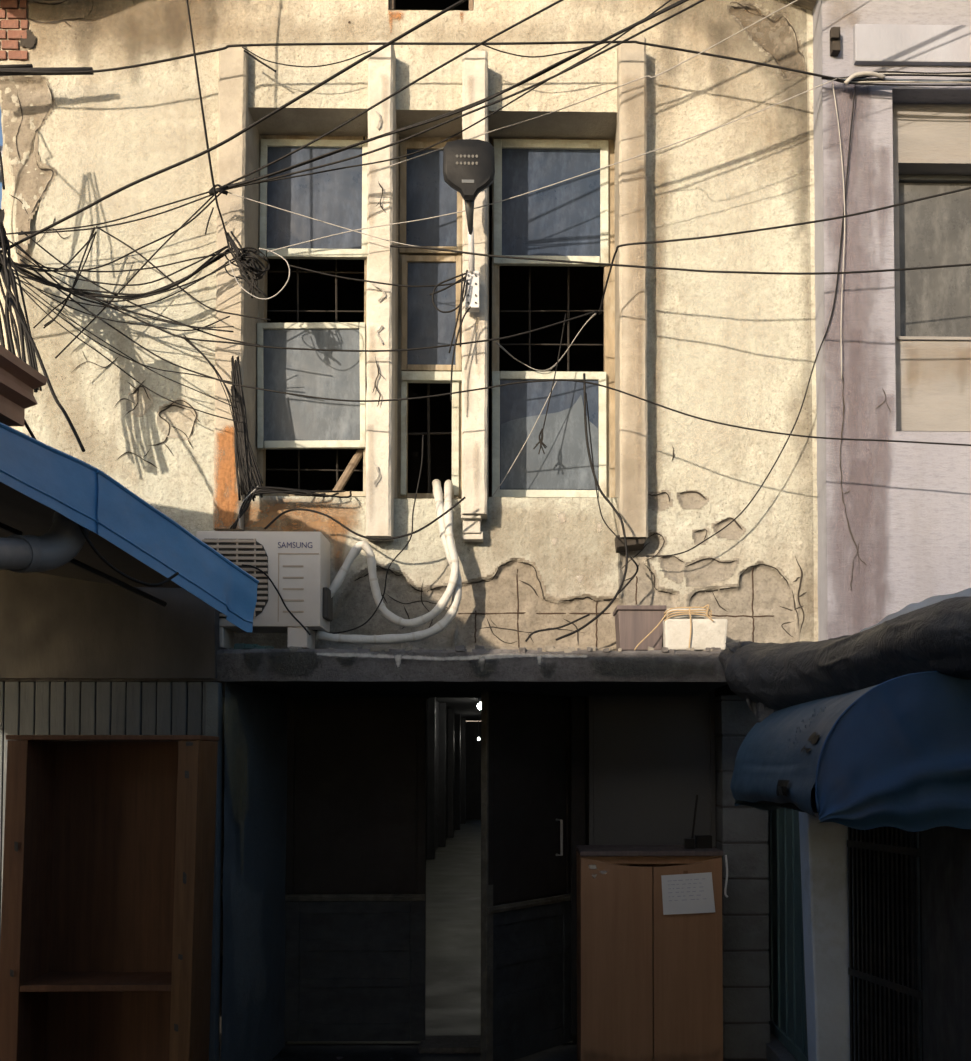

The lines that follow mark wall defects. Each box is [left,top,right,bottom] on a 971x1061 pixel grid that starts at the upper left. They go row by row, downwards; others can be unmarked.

flaking render [0,0,29,61]
flaking render [0,75,57,263]
peeling [126,383,198,440]
rust [214,426,354,568]
peeling [648,490,709,511]
flaking render [317,517,803,654]